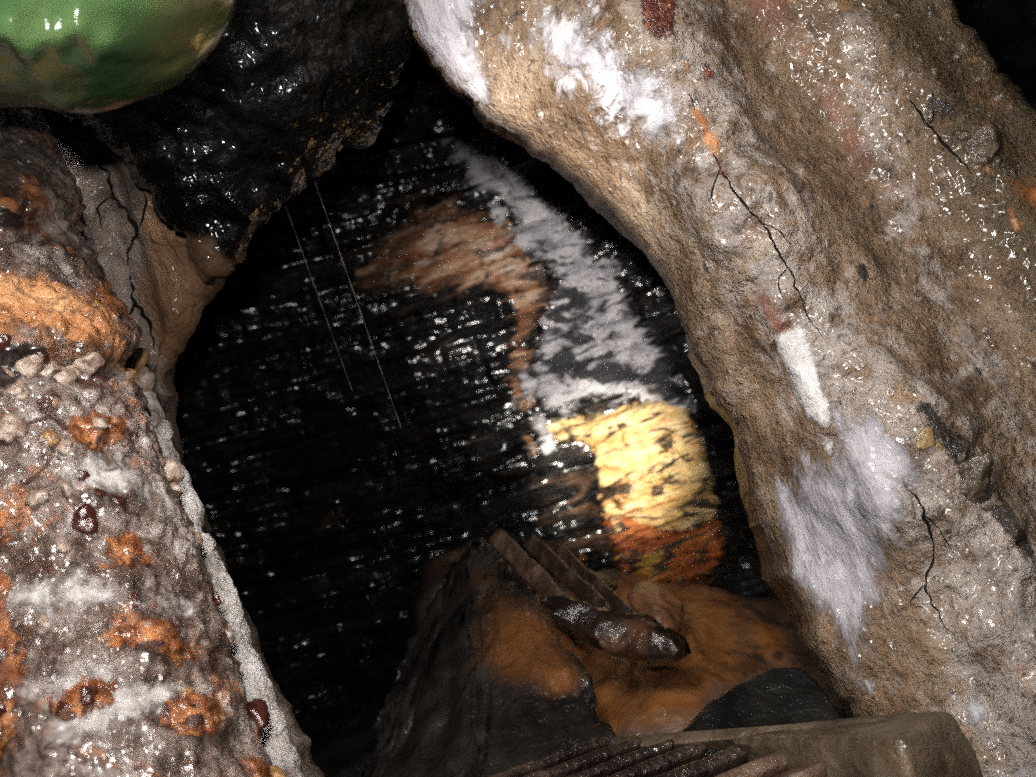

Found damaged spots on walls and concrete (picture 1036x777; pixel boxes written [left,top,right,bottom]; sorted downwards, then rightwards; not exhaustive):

efflorescence [403,0,488,109]
efflorescence [529,0,683,143]
rust [640,0,678,39]
crack [910,92,972,174]
rust [0,269,137,384]
crack [85,141,155,349]
efflorescence [441,130,696,455]
crack [688,93,823,337]
rust [71,469,164,568]
efflorescence [776,326,921,658]
crack [903,476,954,628]
rust [48,676,118,722]